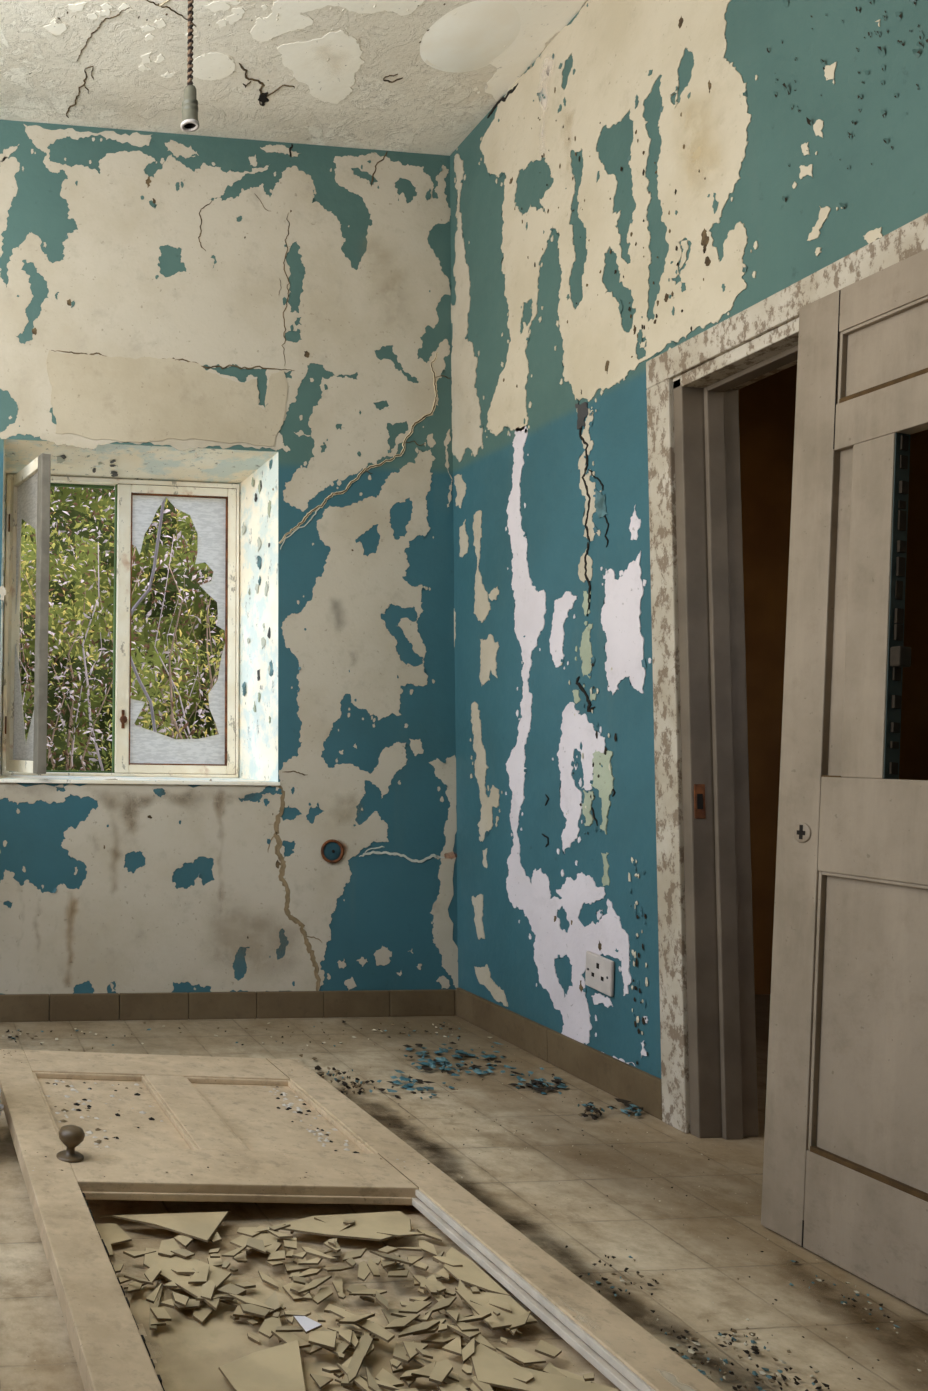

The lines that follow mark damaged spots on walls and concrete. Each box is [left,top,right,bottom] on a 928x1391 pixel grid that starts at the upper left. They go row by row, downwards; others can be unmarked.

crack [66,0,196,118]
crack [239,63,295,106]
peeling [824,62,837,84]
peeling [792,119,824,189]
peeling [807,206,843,257]
peeling [864,227,883,244]
peeling [0,0,758,1066]
crack [268,771,322,991]
peeling [607,1098,643,1116]